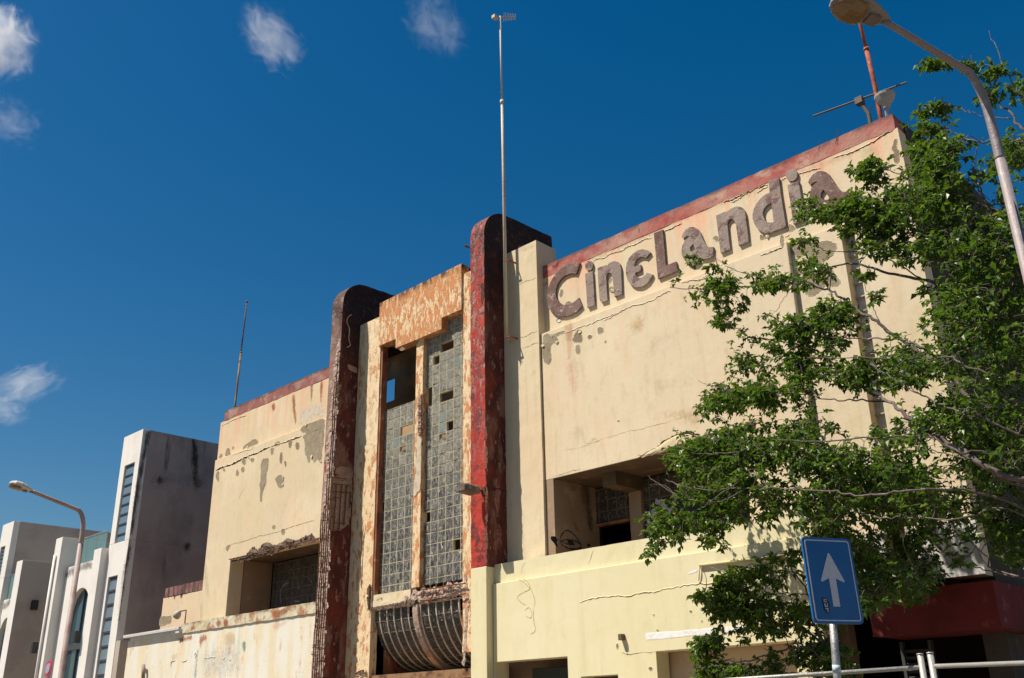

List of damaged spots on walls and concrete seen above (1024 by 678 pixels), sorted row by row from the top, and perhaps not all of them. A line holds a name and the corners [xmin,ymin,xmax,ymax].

crack [723,130,893,203]
spalling [541,318,607,365]
water stain [192,439,201,487]
crack [216,427,322,471]
spalling [223,339,358,678]
spalling [484,426,502,563]
crack [579,582,713,603]